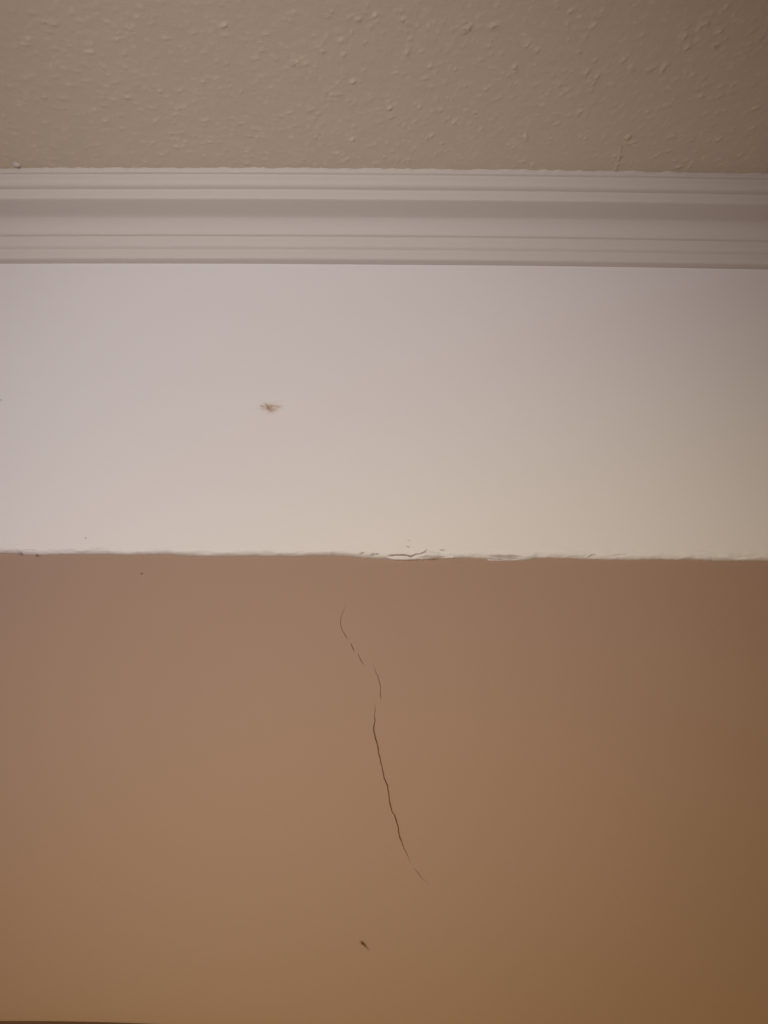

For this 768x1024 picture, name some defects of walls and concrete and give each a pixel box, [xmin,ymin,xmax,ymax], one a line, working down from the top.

crack [373,679,413,864]